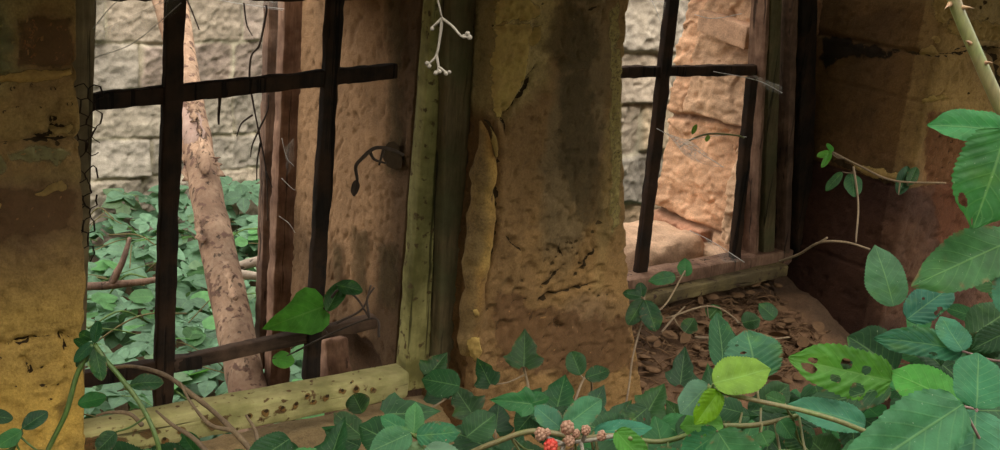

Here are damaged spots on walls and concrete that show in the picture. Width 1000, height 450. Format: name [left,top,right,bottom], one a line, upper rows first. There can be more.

crack [908,46,1000,87]
crack [484,67,534,135]
crack [3,116,66,144]
crack [491,159,500,254]
crack [538,283,588,301]
crack [8,331,69,349]